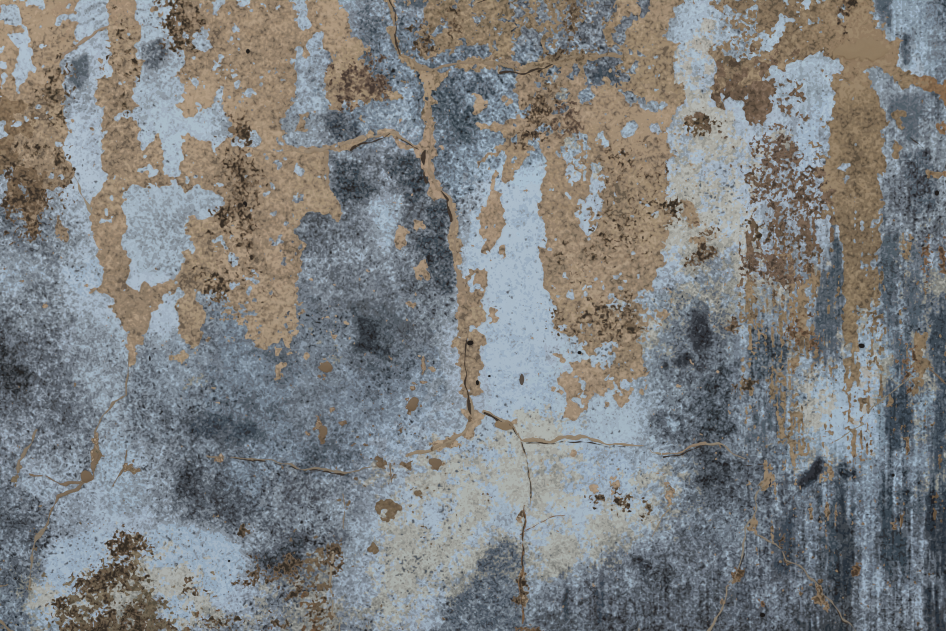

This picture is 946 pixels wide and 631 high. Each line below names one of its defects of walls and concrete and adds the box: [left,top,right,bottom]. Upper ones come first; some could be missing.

peeling [63,256,104,297]
crack [239,0,629,303]
crack [0,354,130,631]
damp [0,282,238,631]
crack [206,339,856,631]